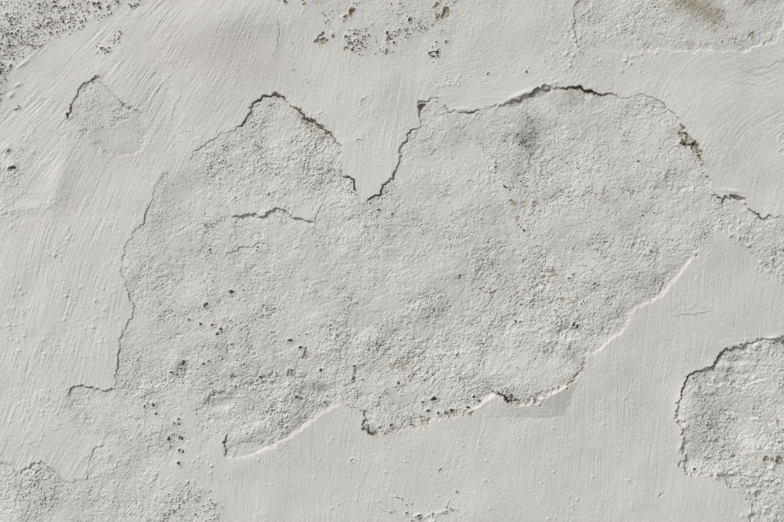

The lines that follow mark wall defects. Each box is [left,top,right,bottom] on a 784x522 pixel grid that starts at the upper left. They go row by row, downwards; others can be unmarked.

flaking render [572,0,784,55]
spalling [66,75,784,468]
spalling [0,442,159,522]
spalling [674,336,784,522]